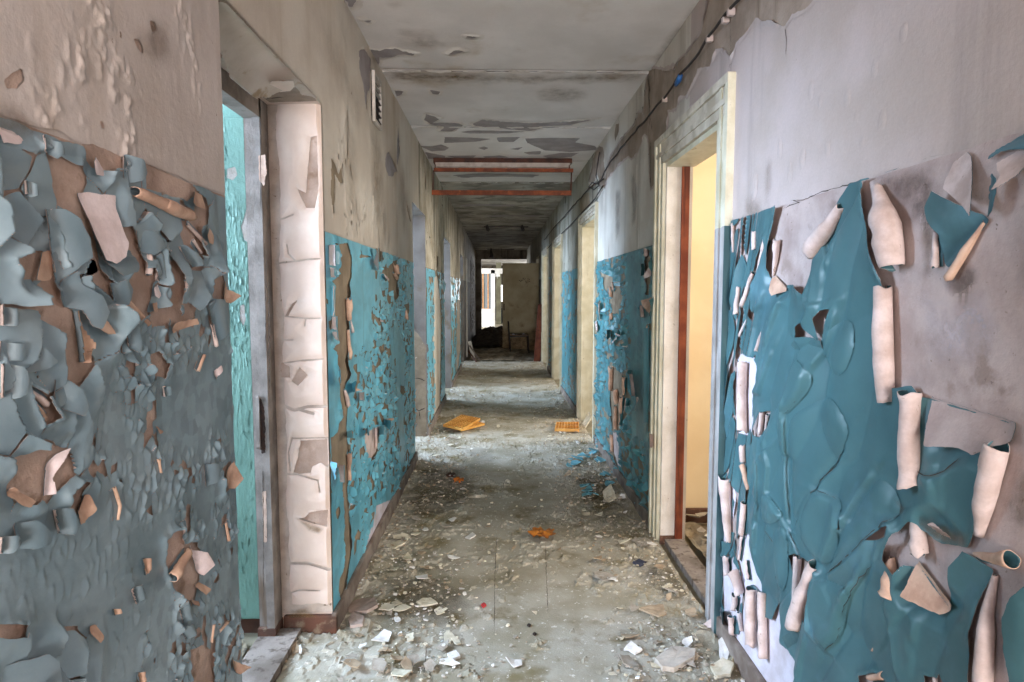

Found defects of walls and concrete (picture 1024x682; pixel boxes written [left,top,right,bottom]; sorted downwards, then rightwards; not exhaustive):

peeling [2,654,62,682]
peeling [6,448,71,507]
peeling [0,486,97,554]
peeling [0,144,246,421]
peeling [166,531,230,682]
peeling [298,136,343,219]
peeling [294,243,441,597]
peeling [420,0,817,212]
peeling [608,247,654,467]
peeling [704,332,817,682]
peeling [733,186,847,337]
peeling [866,131,1024,682]